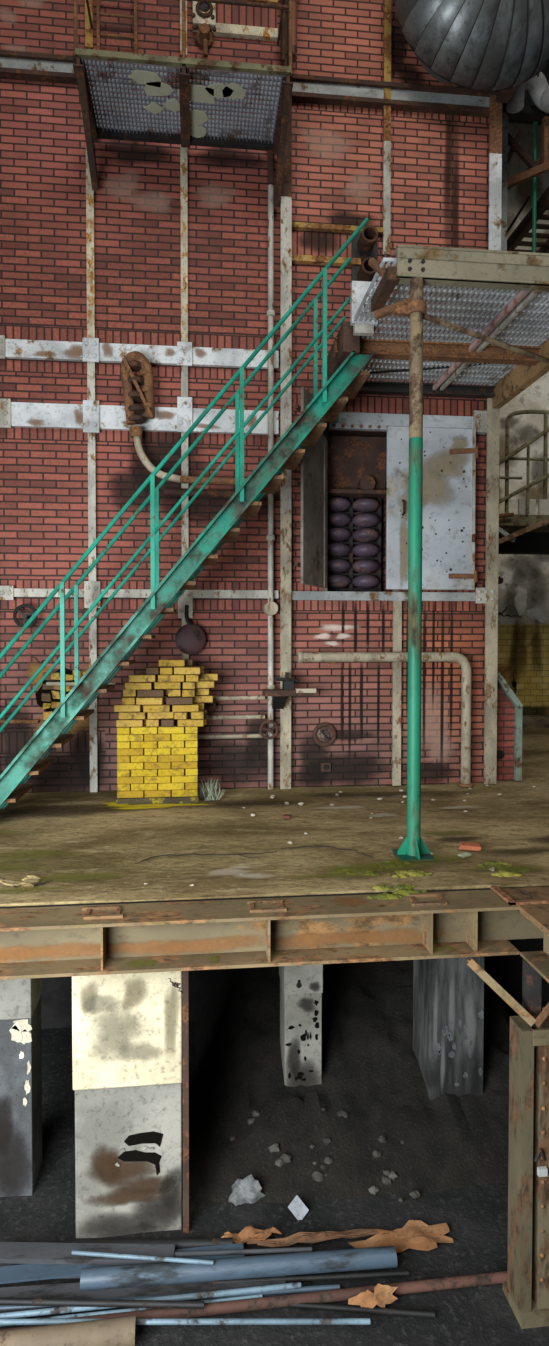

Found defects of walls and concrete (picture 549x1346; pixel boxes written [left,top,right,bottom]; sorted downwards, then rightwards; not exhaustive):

rust [36,346,83,356]
damp [506,555,549,614]
damp [510,631,540,689]
rust [0,937,253,959]
peeling [9,1019,32,1106]
peeling [285,1000,319,1081]
damp [88,1171,183,1236]